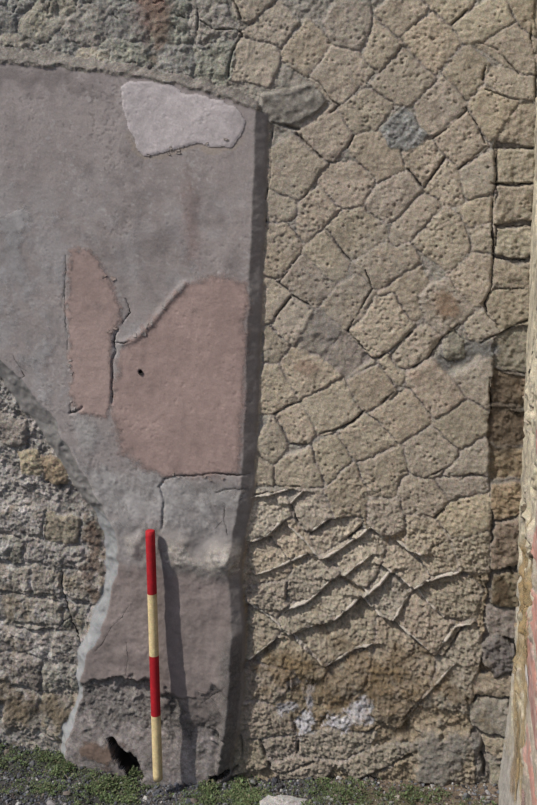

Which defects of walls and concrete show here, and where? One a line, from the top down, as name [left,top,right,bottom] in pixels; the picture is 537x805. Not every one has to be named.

peeling [65,247,249,483]
crack [60,574,128,651]
flaking render [0,360,230,787]
damp [278,678,374,736]